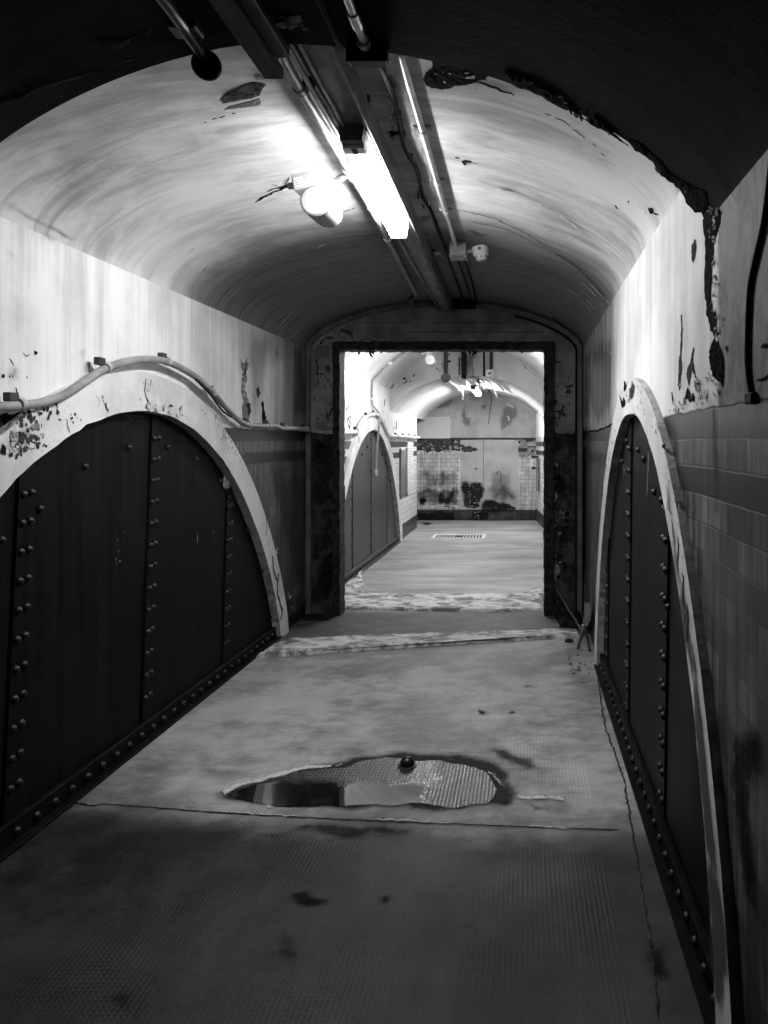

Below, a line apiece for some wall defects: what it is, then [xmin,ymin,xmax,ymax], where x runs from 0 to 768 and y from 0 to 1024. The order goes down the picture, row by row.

peeling [221,75,266,110]
crack [255,177,290,203]
flaking render [423,61,728,415]
peeling [1,403,82,460]
peeling [239,355,266,422]
peeling [619,381,659,433]
water stain [418,455,516,525]
crack [76,677,659,1019]